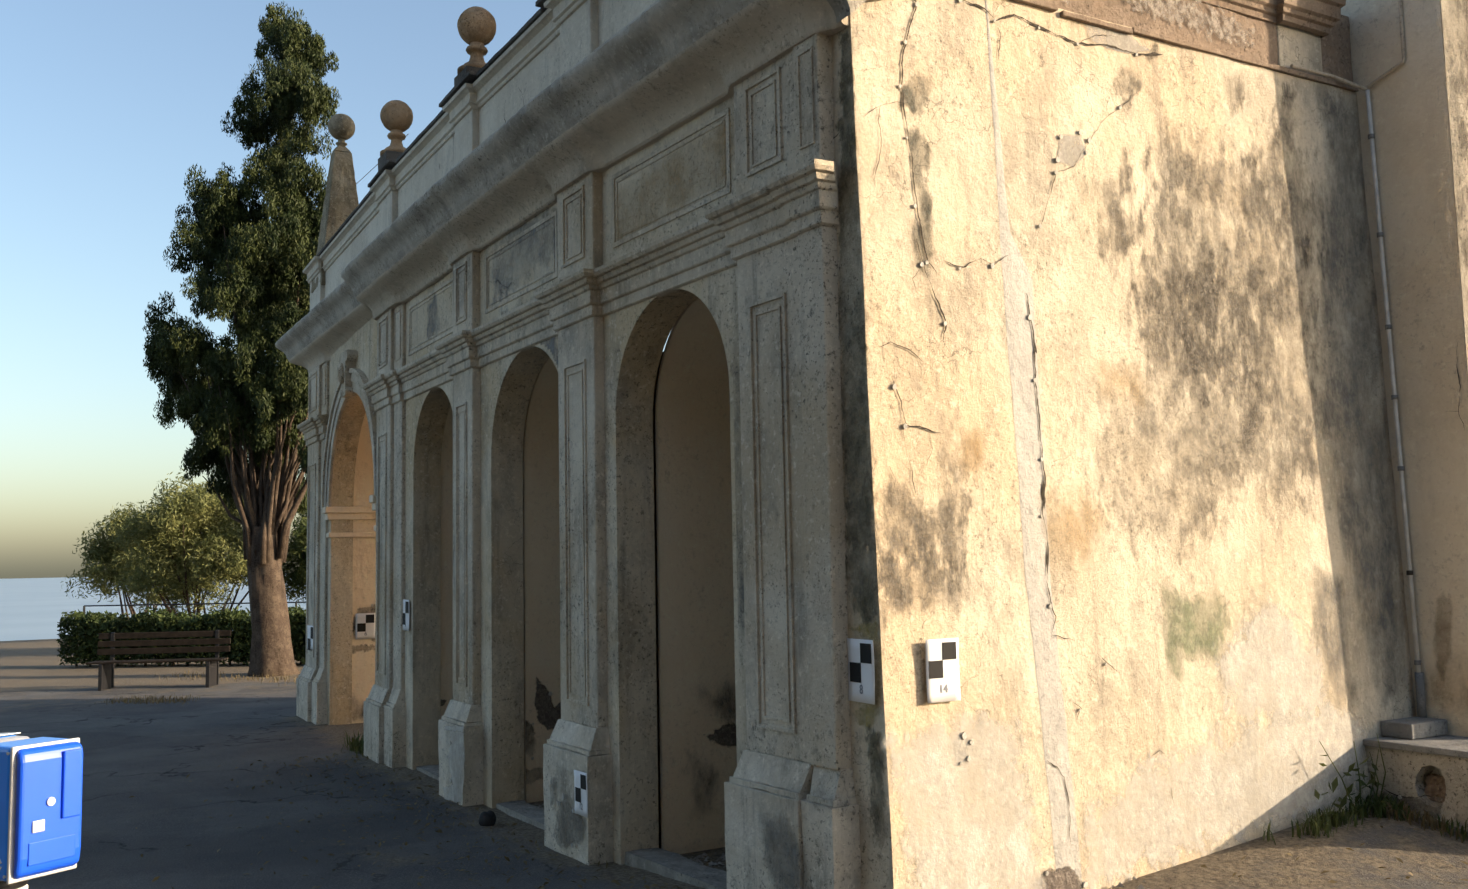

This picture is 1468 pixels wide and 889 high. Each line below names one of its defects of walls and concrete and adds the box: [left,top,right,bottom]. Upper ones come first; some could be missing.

crack [833,0,1163,497]
crack [1026,294,1117,671]
water stain [1085,133,1396,889]
peeling [525,678,561,772]
crack [1048,761,1071,844]